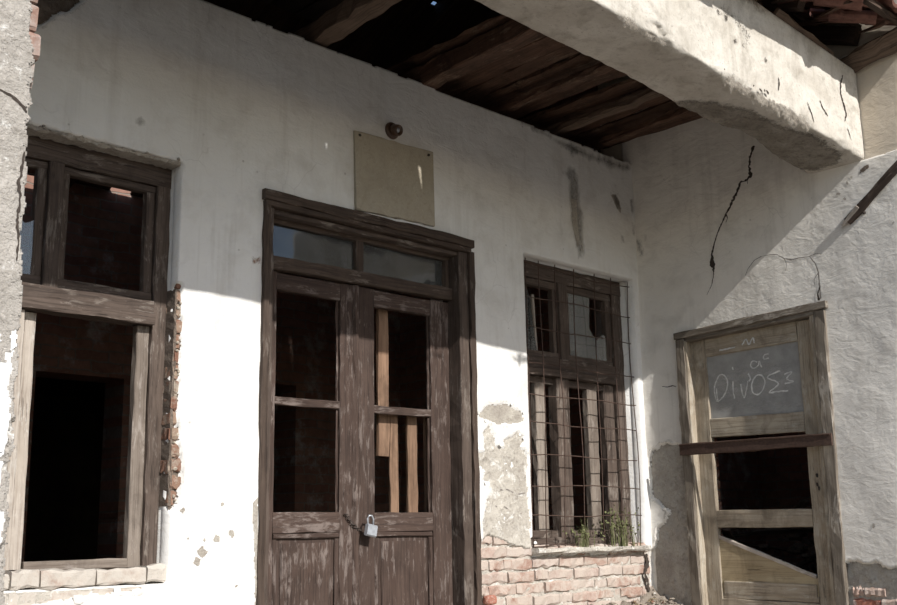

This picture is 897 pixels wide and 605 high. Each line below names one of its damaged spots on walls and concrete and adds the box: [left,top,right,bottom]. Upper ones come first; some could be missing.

crack [807,75,851,138]
peeling [0,0,181,362]
water stain [568,171,583,252]
crack [707,146,756,294]
crack [746,253,821,301]
spalling [160,284,185,513]
peeling [0,428,10,513]
flaking render [478,402,692,605]
flaking render [0,544,166,605]
peeling [194,530,234,566]
spalling [848,561,897,605]